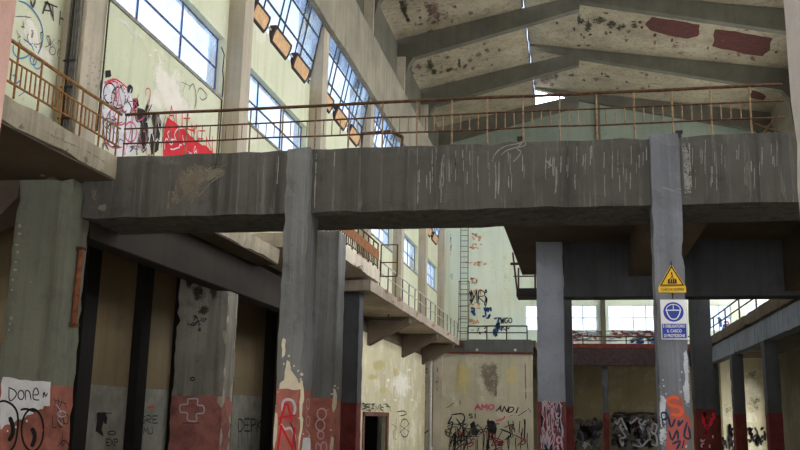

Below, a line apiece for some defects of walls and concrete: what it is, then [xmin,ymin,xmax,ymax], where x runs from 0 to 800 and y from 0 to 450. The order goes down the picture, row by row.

damp [399,0,457,32]
damp [573,12,638,47]
spalling [638,17,700,42]
spalling [707,29,778,56]
damp [410,43,502,76]
peeling [277,338,311,450]
damp [454,359,527,402]